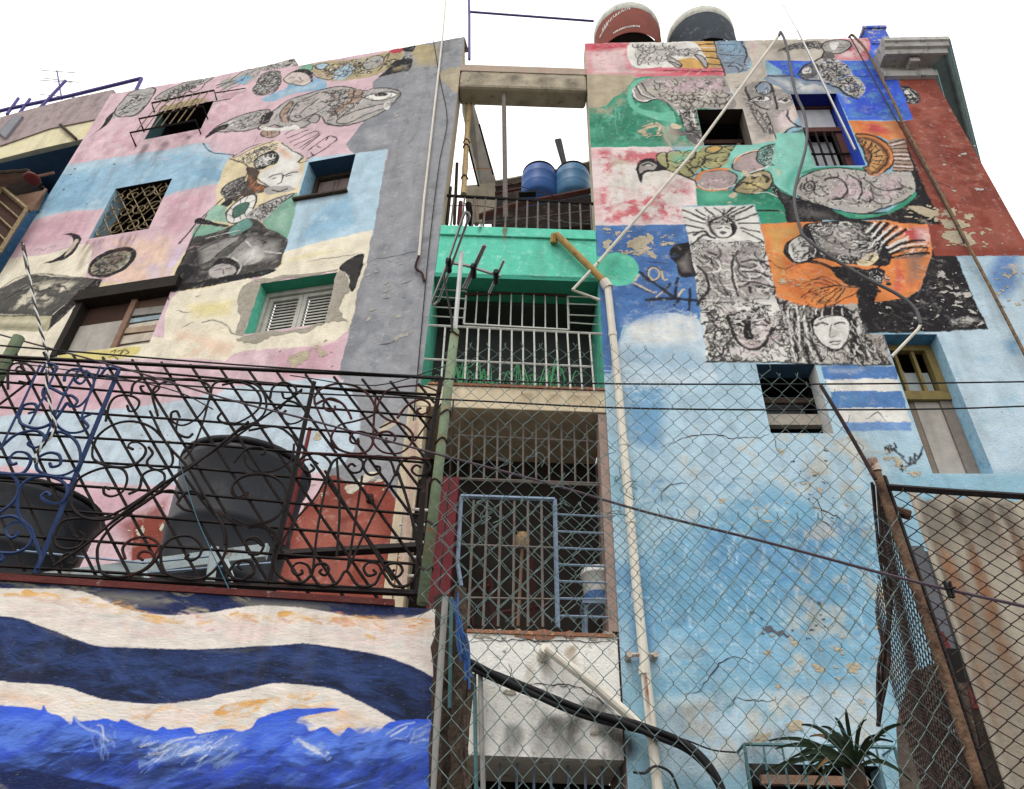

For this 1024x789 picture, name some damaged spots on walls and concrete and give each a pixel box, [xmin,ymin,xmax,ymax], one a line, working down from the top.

peeling [904,204,1003,248]
spalling [236,256,402,344]
corrosion [940,549,973,636]
crack [686,656,754,694]
spalling [749,601,879,694]
damp [542,717,578,741]